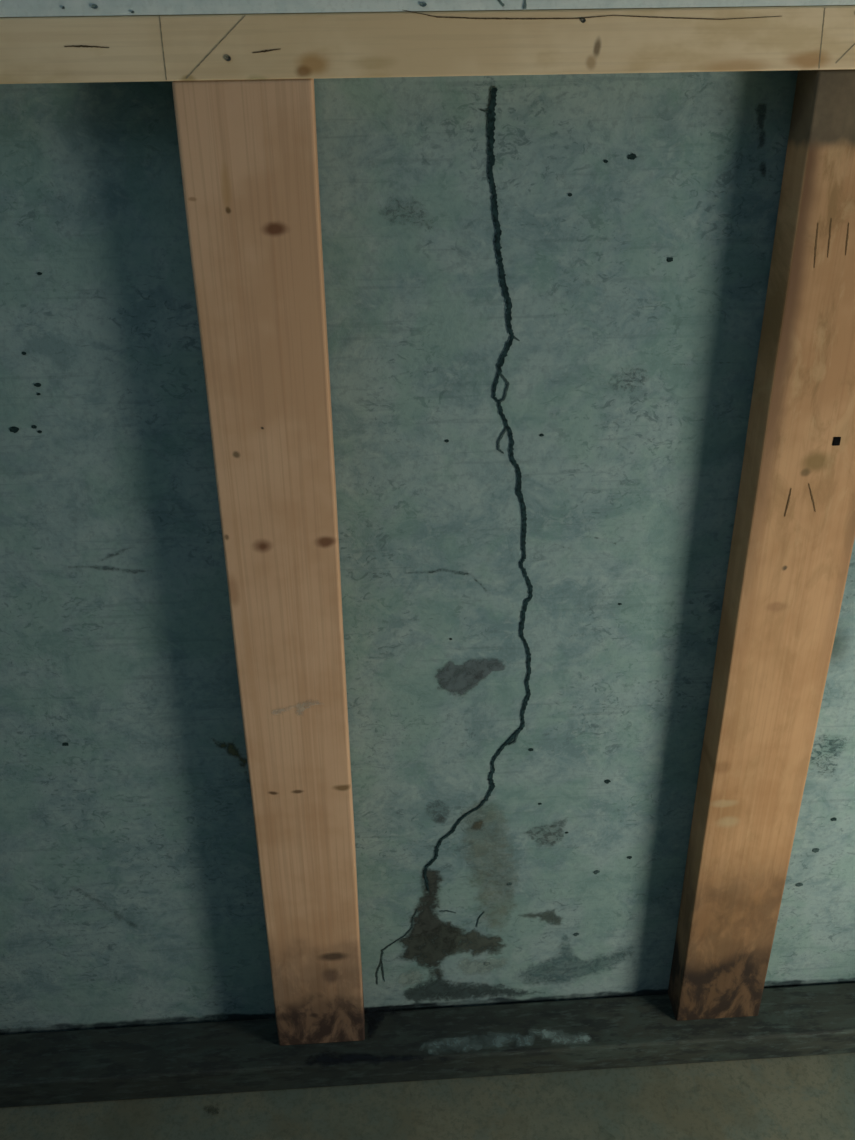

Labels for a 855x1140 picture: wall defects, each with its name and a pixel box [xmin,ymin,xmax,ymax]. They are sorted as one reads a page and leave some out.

crack [376,88,533,985]
leakage [364,870,632,1036]
leakage [307,1029,590,1067]